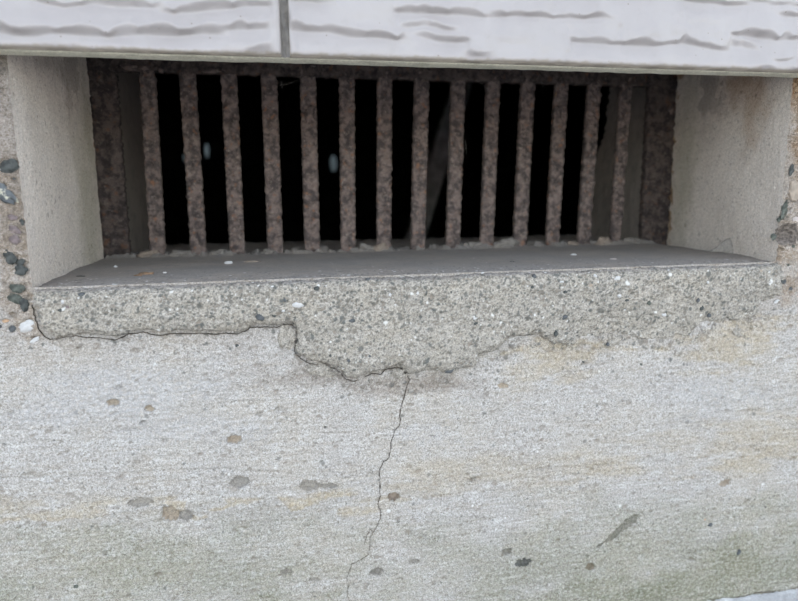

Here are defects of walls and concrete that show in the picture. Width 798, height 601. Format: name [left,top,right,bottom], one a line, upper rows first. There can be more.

crack [31,305,410,601]